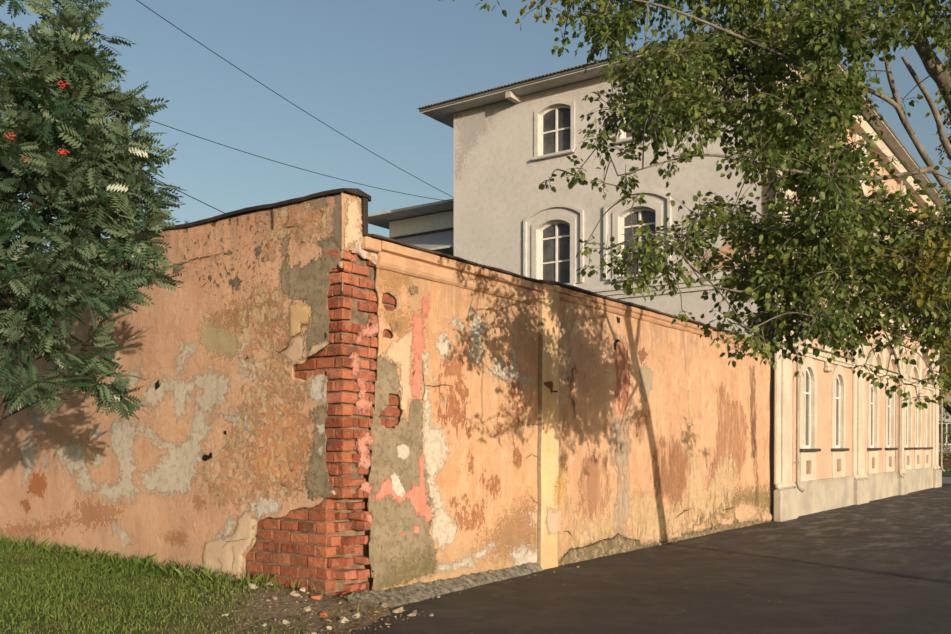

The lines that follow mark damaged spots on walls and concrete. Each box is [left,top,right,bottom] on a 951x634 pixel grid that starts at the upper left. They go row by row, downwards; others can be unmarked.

spalling [9,187,532,596]
damp [576,453,611,519]
damp [638,347,653,402]
peeling [528,340,773,566]
damp [650,436,694,510]
damp [697,368,772,525]